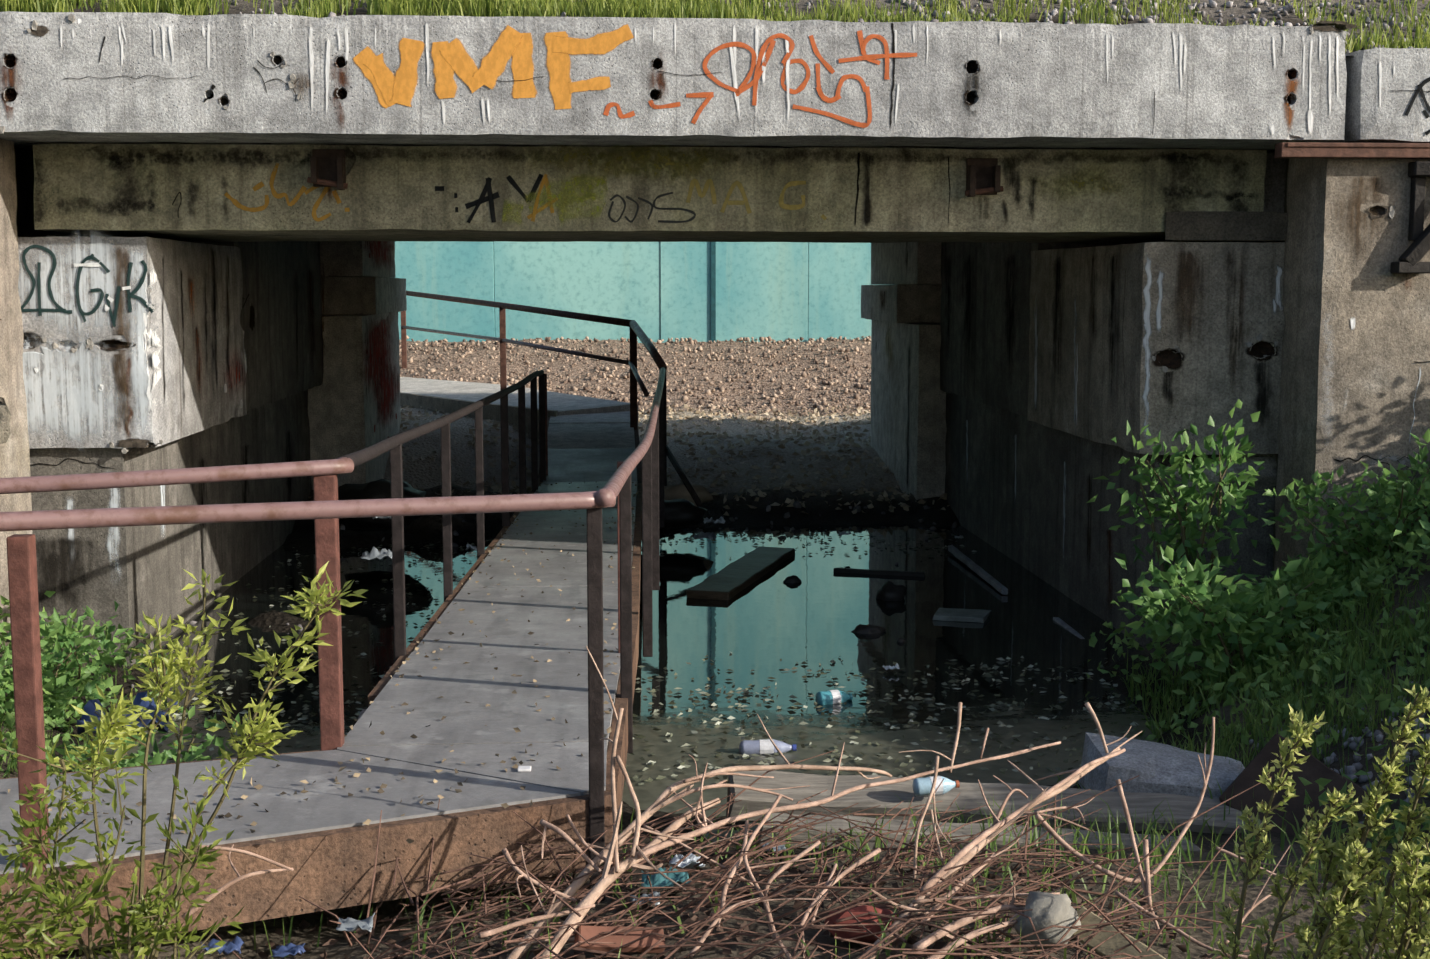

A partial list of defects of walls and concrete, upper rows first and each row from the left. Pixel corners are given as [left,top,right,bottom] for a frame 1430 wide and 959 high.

corrosion [1284,69,1298,127]
damp [35,146,193,220]
damp [709,151,1254,225]